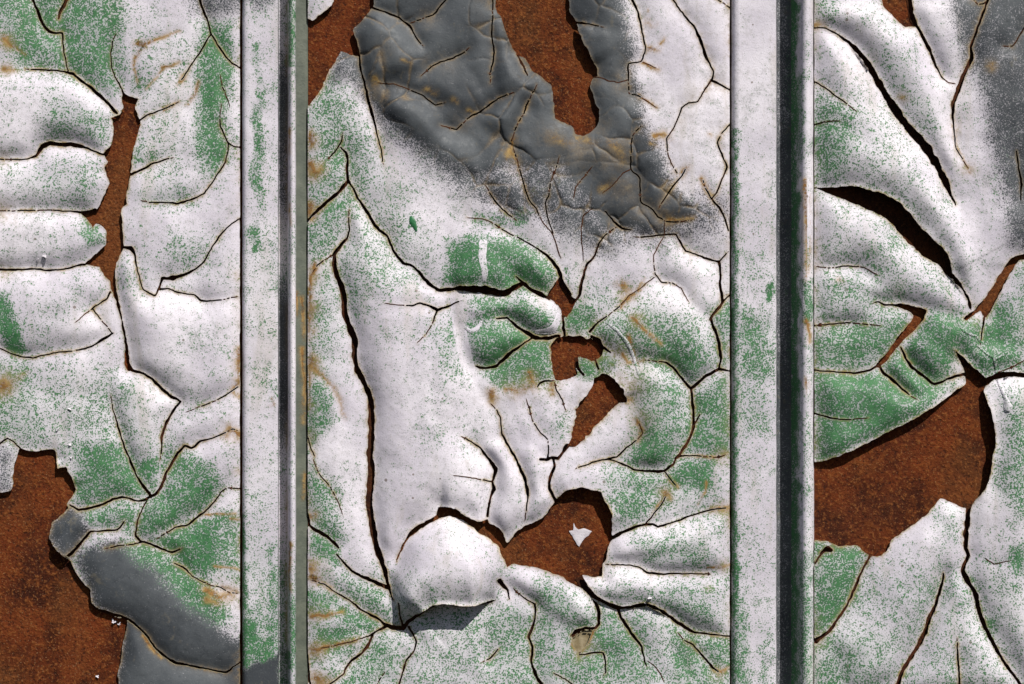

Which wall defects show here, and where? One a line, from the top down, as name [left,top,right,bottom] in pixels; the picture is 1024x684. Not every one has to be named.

crack [26,0,240,205]
peeling [308,0,386,118]
peeling [482,0,612,148]
crack [814,0,989,204]
peeling [0,428,140,684]
peeling [67,72,153,380]
crack [69,369,241,673]
crack [124,219,239,302]
crack [308,0,729,684]
peeling [538,264,636,460]
peeling [814,351,1000,570]
crack [896,503,1022,684]